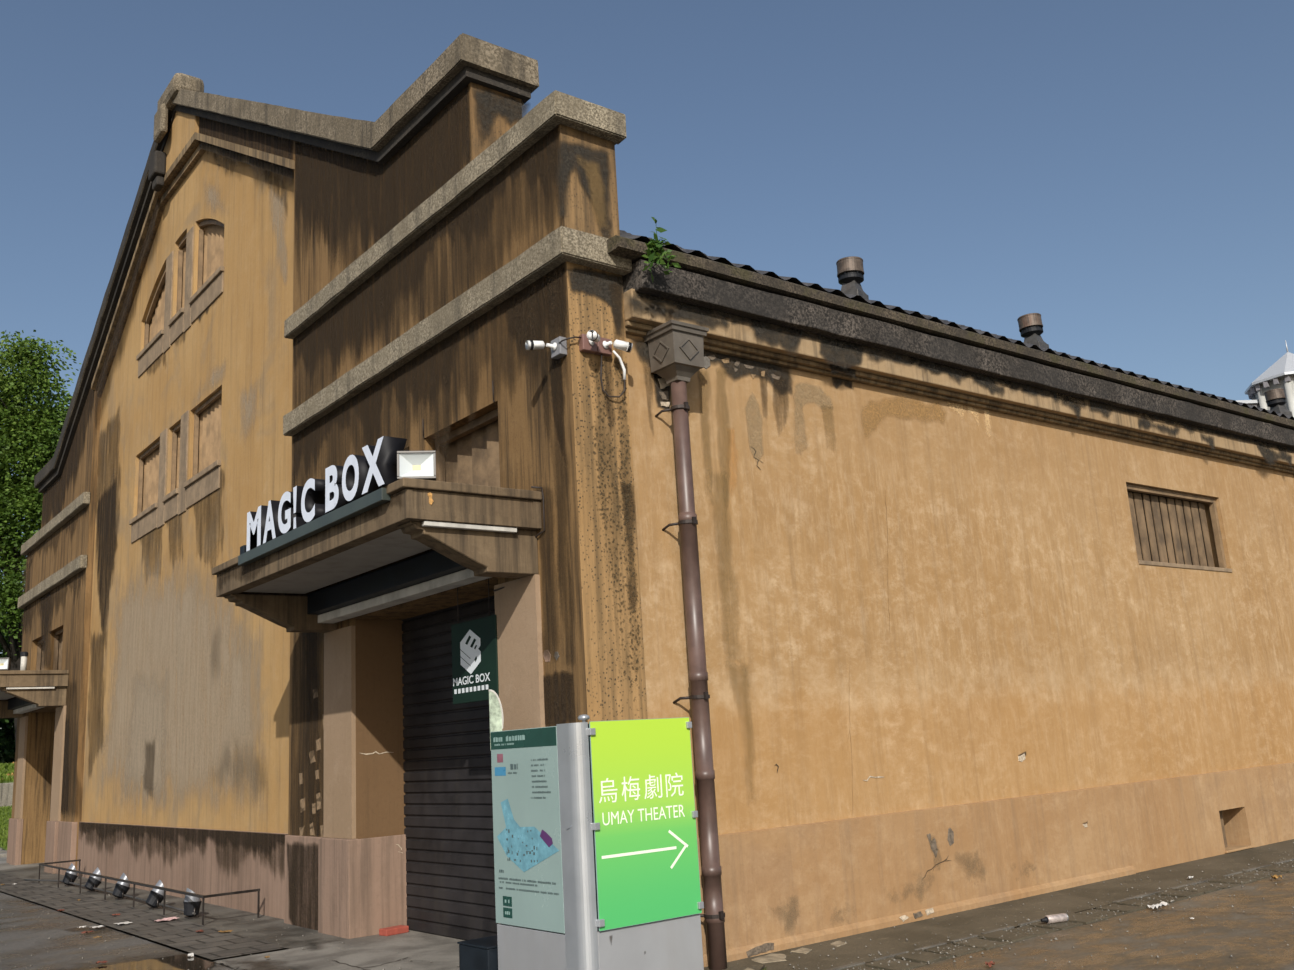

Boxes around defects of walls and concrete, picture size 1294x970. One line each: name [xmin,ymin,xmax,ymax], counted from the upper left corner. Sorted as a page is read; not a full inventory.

damp [294,126,558,407]
damp [614,286,1294,466]
damp [22,192,288,871]
damp [592,361,640,687]
peeling [926,828,954,858]